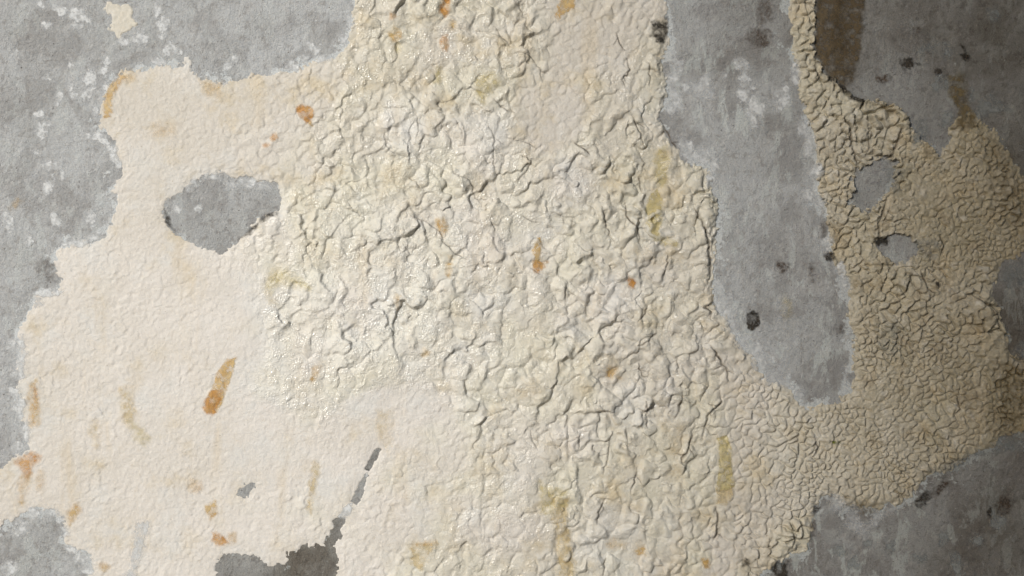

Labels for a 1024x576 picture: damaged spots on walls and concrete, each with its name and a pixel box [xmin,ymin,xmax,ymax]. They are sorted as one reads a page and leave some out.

water stain [815,0,865,102]
corrosion [297,105,313,124]
peeling [0,0,355,469]
corrosion [532,238,543,271]
crack [291,0,925,576]
peeling [658,0,1024,576]
corrosion [203,358,235,414]
peeling [235,483,256,499]
peeling [351,448,382,505]
peeling [0,506,94,576]
peeling [215,518,346,576]